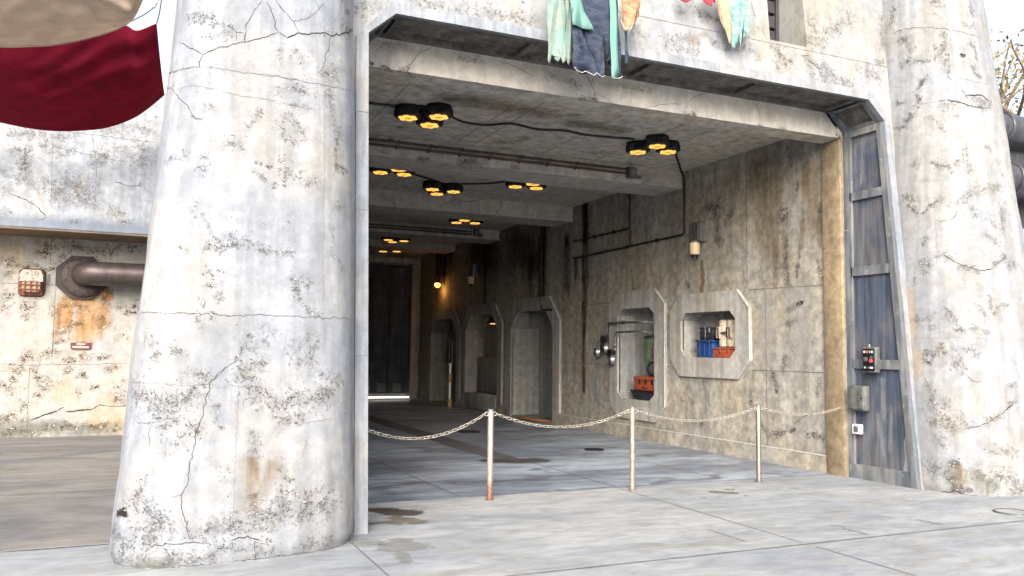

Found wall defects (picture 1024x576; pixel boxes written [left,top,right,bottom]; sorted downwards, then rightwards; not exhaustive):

crack [169,2,355,120]
crack [929,78,990,109]
crack [30,349,339,569]
damp [368,507,430,525]